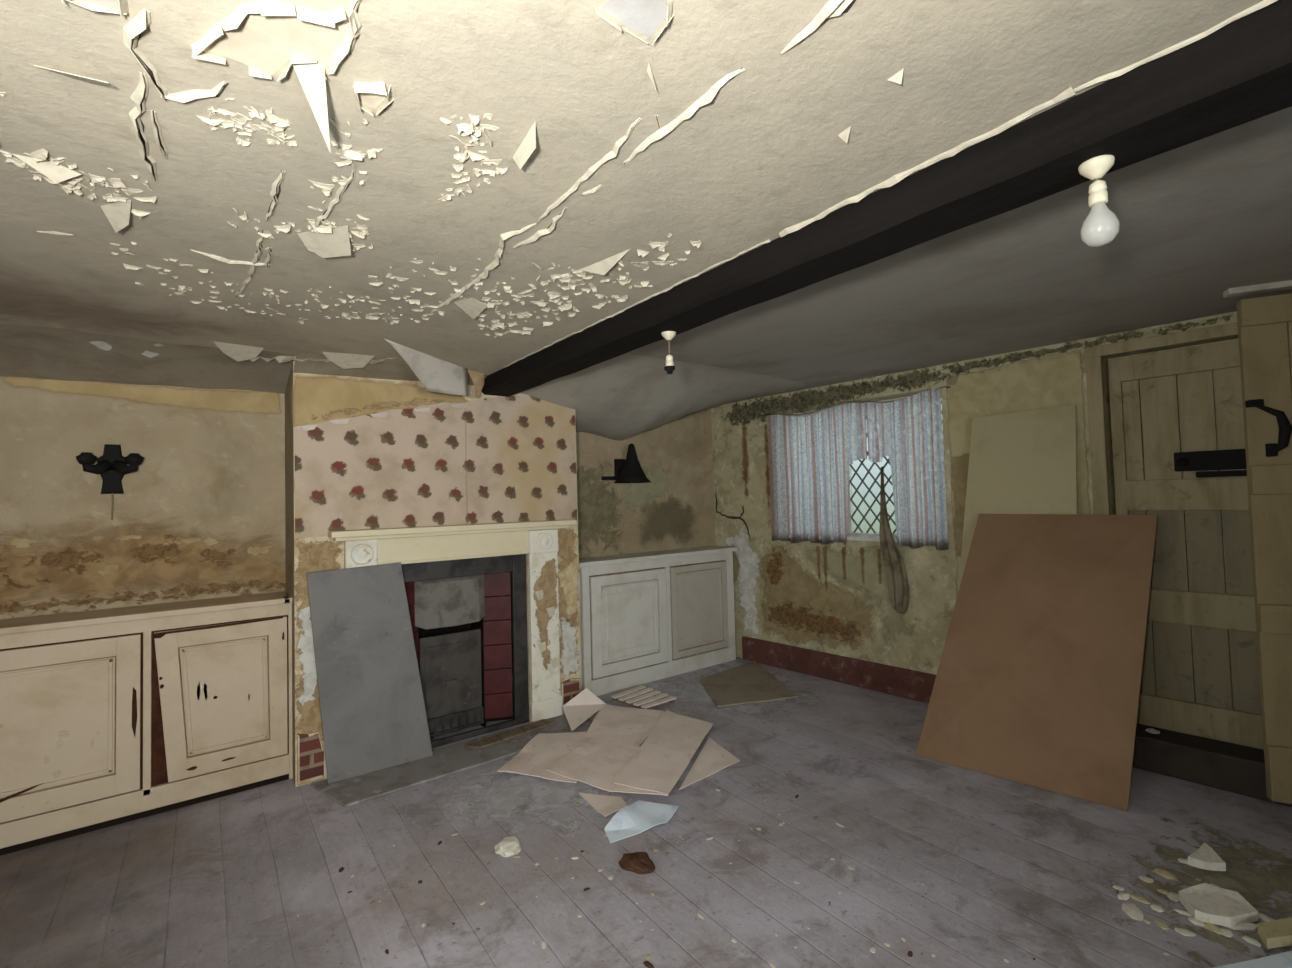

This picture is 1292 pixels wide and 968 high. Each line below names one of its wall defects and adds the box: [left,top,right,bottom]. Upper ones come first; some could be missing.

peeling [0,0,1277,368]
damp [0,524,286,618]
flaking render [294,541,342,786]
flaking render [533,529,581,705]
damp [760,546,914,649]